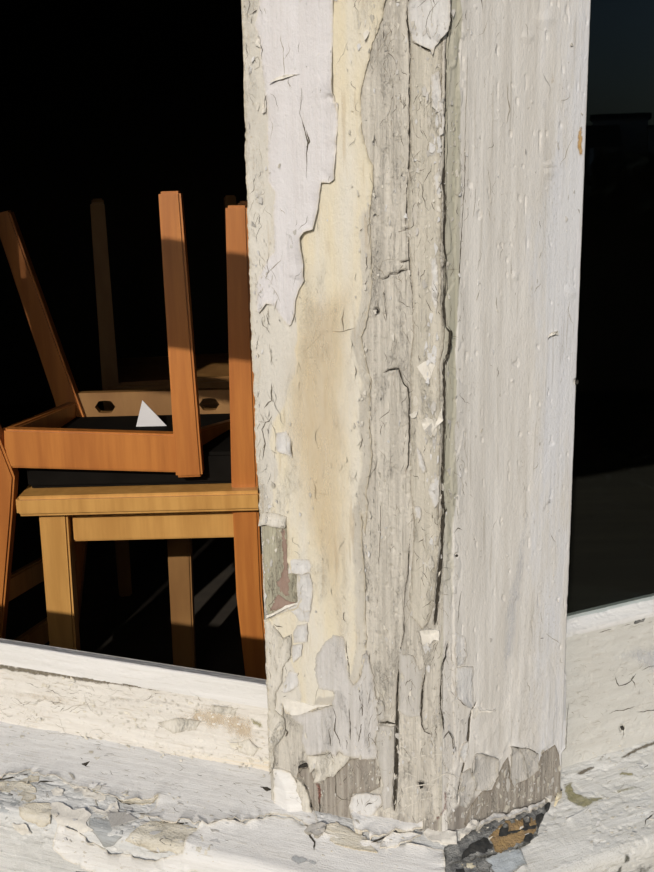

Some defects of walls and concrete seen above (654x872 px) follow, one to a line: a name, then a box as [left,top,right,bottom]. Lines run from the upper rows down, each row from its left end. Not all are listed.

crack [125,0,519,843]
crack [0,674,158,774]
crack [540,612,654,741]